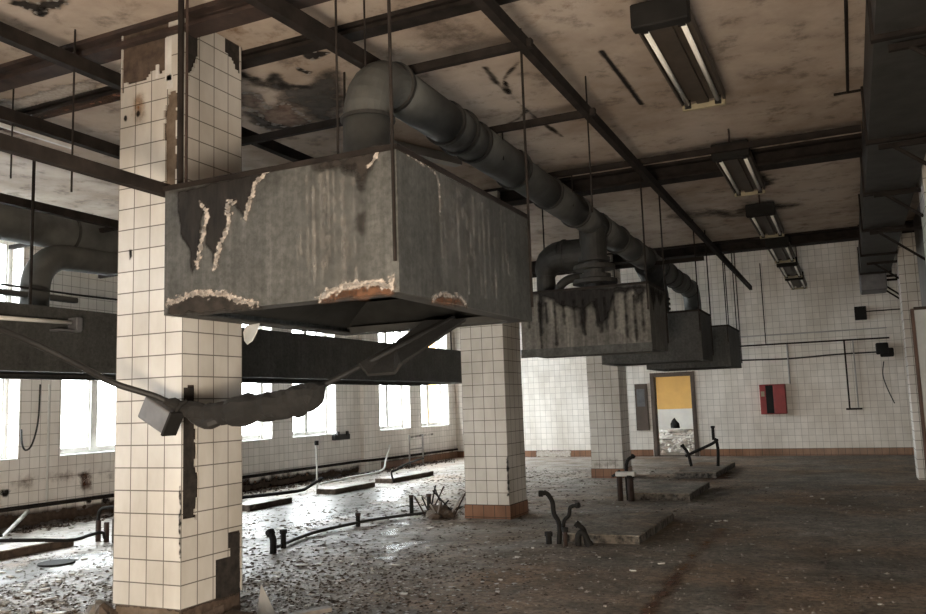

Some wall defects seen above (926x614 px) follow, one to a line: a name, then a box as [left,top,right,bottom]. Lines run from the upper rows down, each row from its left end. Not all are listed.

peeling [0,80,100,110]
damp [241,71,344,121]
peeling [118,23,269,273]
damp [529,300,586,349]
damp [595,286,664,340]
peeling [184,386,194,401]
peeling [179,417,198,558]
peeling [115,531,241,614]